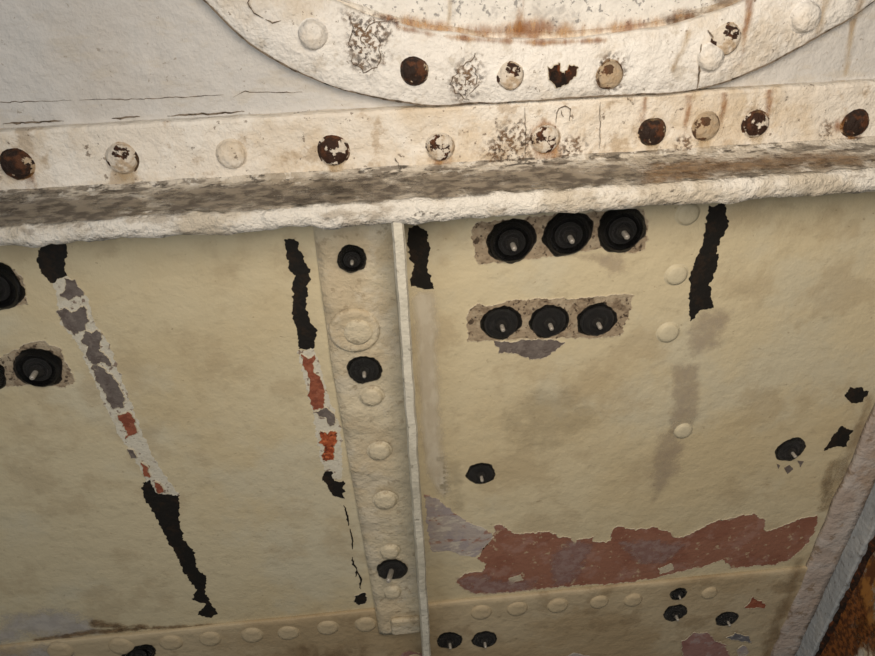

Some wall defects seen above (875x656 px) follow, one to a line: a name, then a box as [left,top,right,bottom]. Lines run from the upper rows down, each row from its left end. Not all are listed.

corrosion [347,13,489,70]
corrosion [502,21,570,45]
corrosion [656,12,693,24]
corrosion [451,58,482,97]
corrosion [486,120,532,163]
peeling [0,340,75,388]
peeling [284,239,346,498]
spalling [845,387,869,403]
peeling [36,244,218,618]
spalling [824,426,853,451]
peeling [424,495,818,595]
corrosion [821,551,875,656]